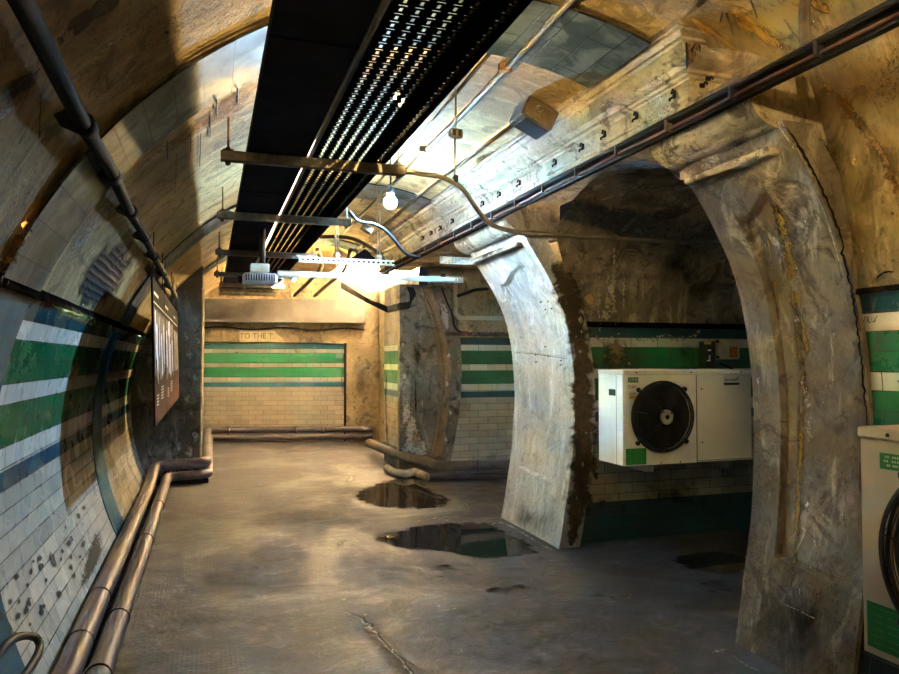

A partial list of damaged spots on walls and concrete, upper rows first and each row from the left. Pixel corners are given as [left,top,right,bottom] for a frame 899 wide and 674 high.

corrosion [816,75,899,215]
spalling [0,526,85,635]
crack [342,599,415,674]